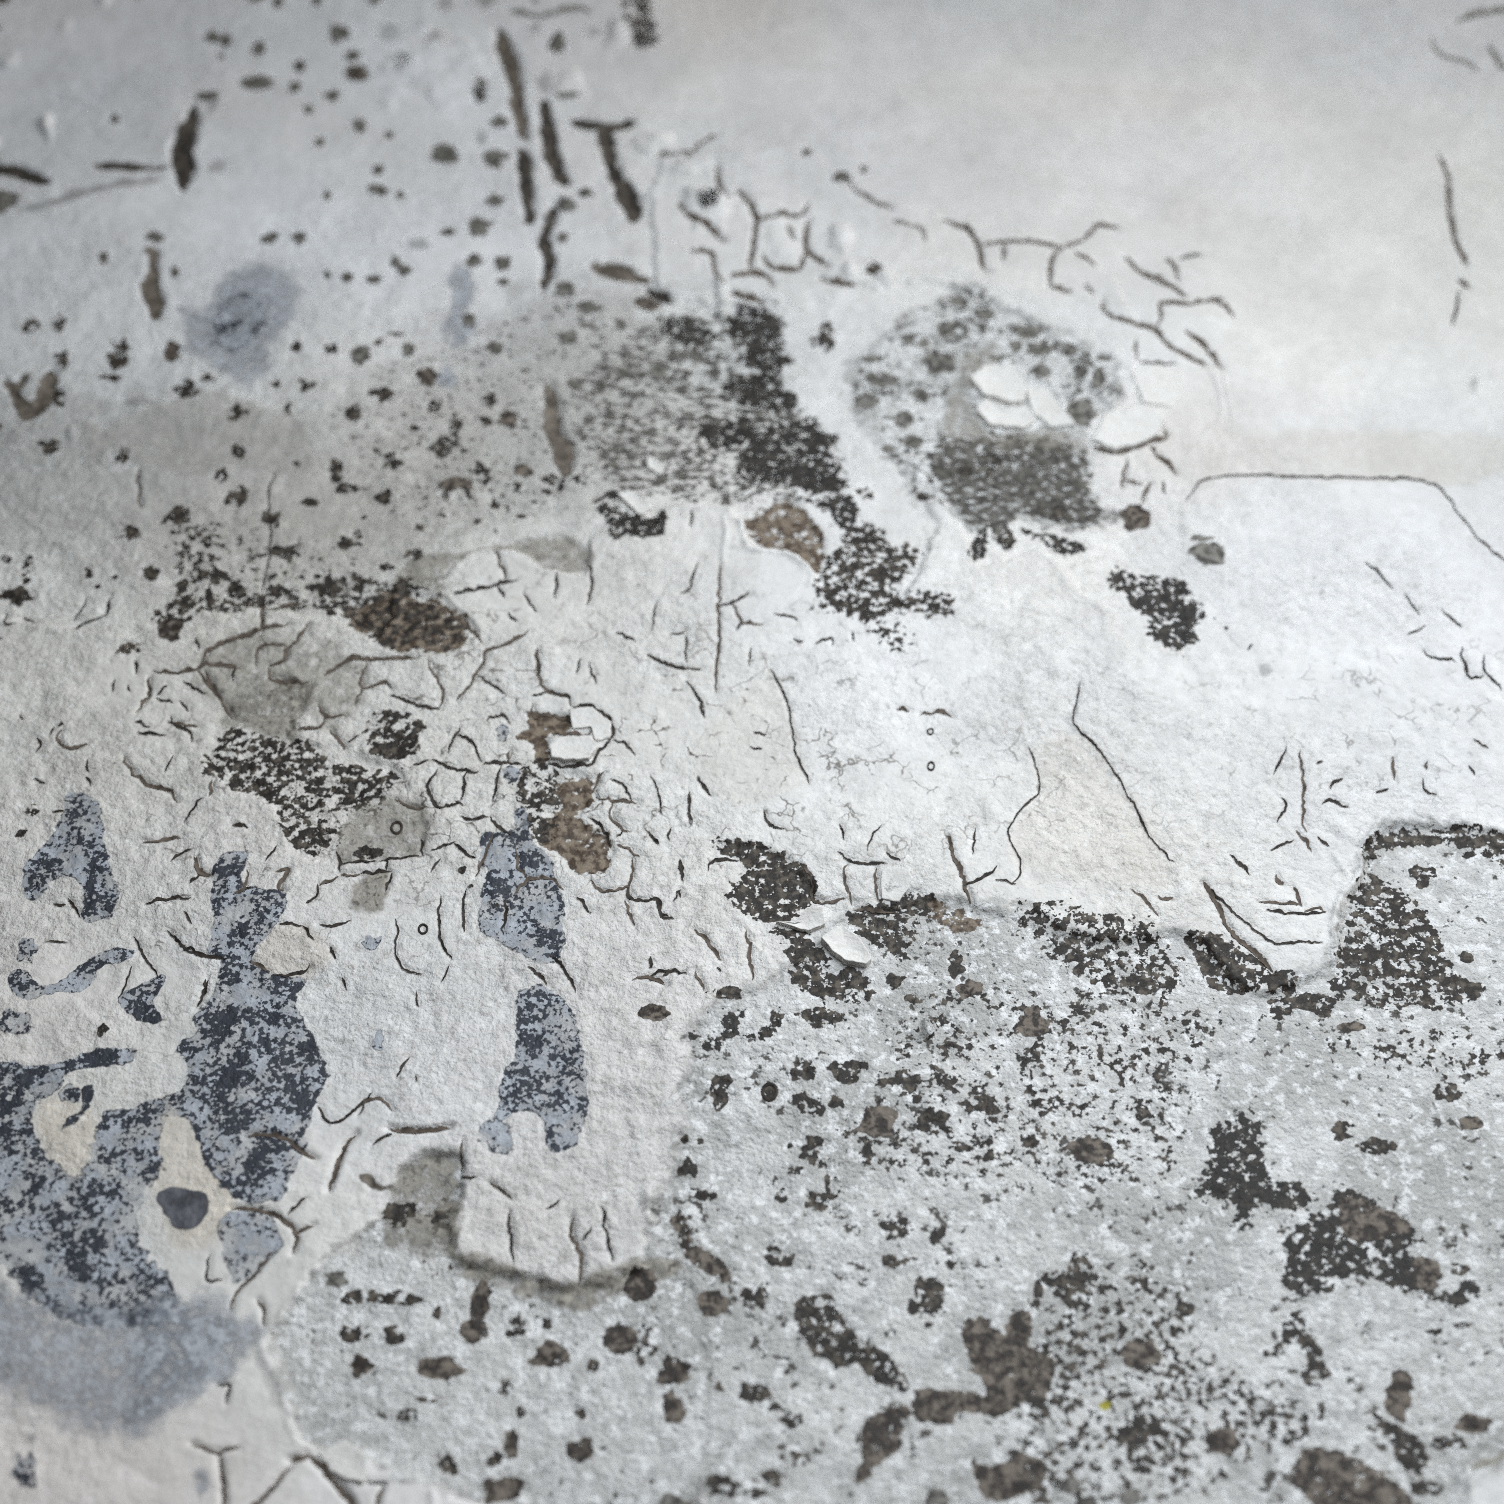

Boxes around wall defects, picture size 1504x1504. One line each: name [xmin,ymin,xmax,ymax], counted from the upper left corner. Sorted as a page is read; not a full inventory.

crack [657,134,861,304]
crack [850,184,1234,369]
spalling [543,377,584,477]
peeling [616,491,652,517]
peeling [647,454,664,477]
flaking render [844,283,1184,533]
leakage [22,792,119,923]
crack [20,468,754,1007]
crack [616,563,855,782]
crack [946,746,1041,904]
crack [1072,681,1437,972]
flaking render [269,816,1504,1504]